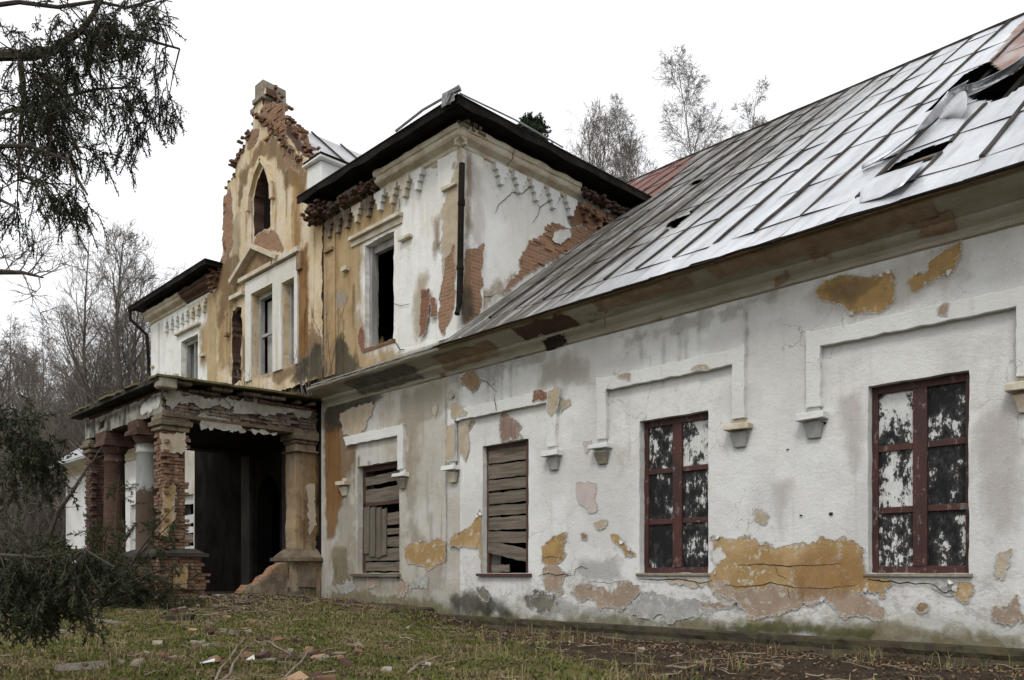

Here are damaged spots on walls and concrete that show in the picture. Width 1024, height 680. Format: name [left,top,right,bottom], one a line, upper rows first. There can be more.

flaking render [247,102,299,174]
flaking render [419,144,485,338]
crack [496,187,563,223]
flaking render [502,199,611,295]
flaking render [813,210,962,316]
flaking render [498,412,522,443]
flaking render [404,509,483,572]
flaking render [524,481,893,624]
crack [538,556,958,595]